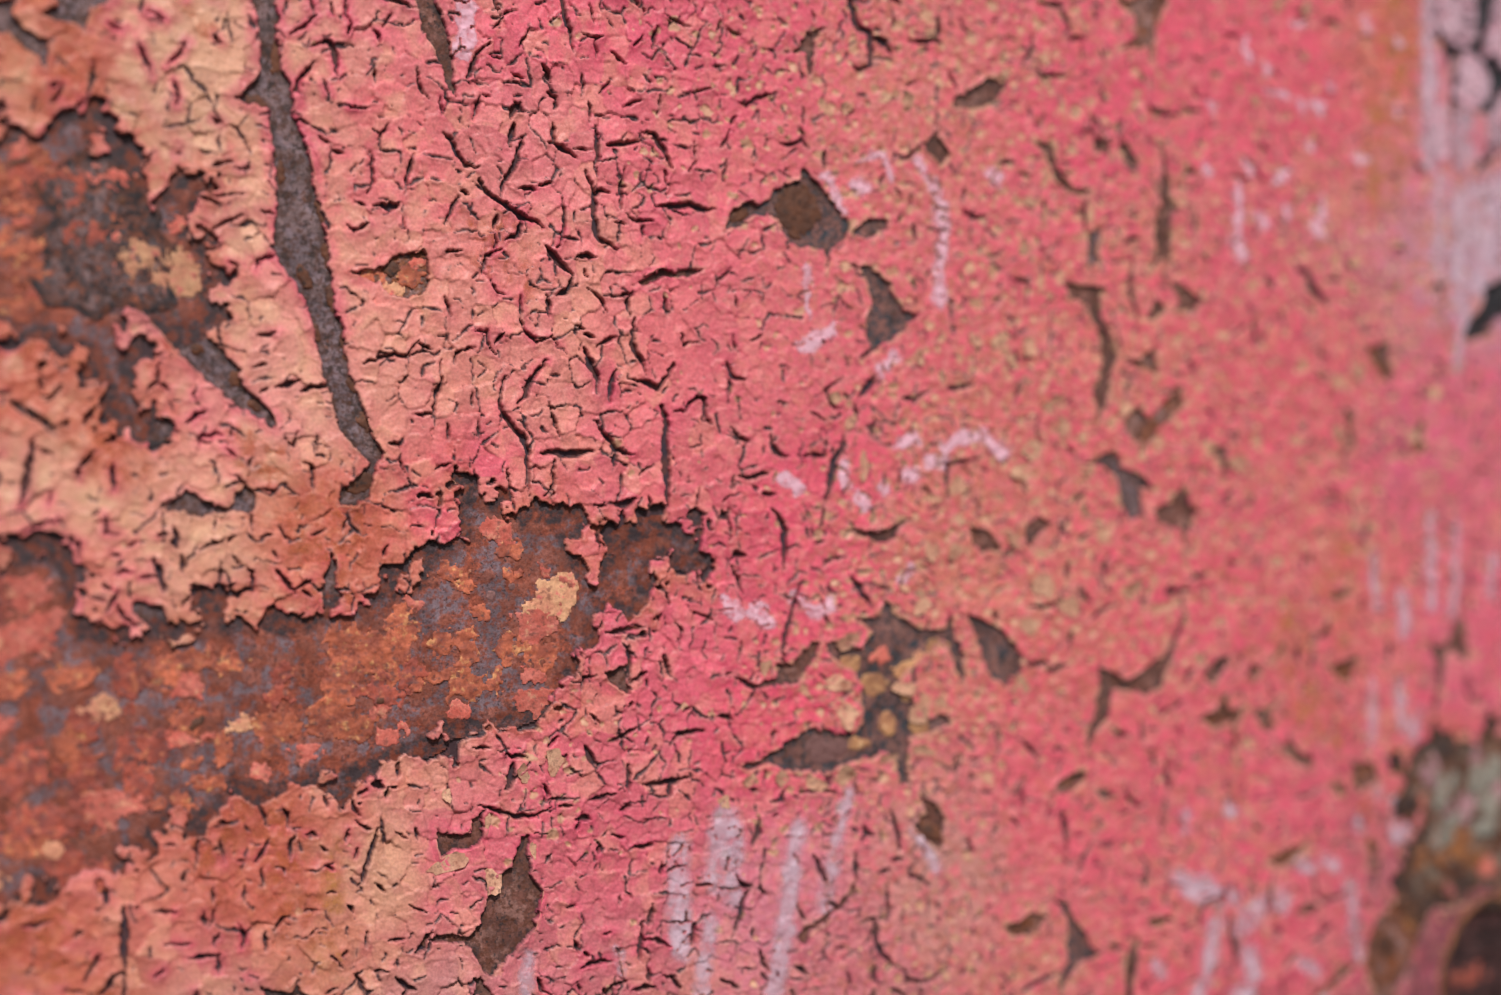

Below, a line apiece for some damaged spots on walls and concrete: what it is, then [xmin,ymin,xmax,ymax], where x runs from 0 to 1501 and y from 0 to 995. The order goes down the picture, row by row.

peeling [0,72,282,448]
peeling [235,0,389,513]
crack [323,130,410,232]
crack [367,0,971,602]
peeling [726,169,886,275]
crack [13,383,318,620]
peeling [0,475,712,921]
crack [442,614,708,849]
peeling [743,583,1030,789]
peeling [420,834,549,995]
crack [699,881,803,986]
crack [717,770,942,995]